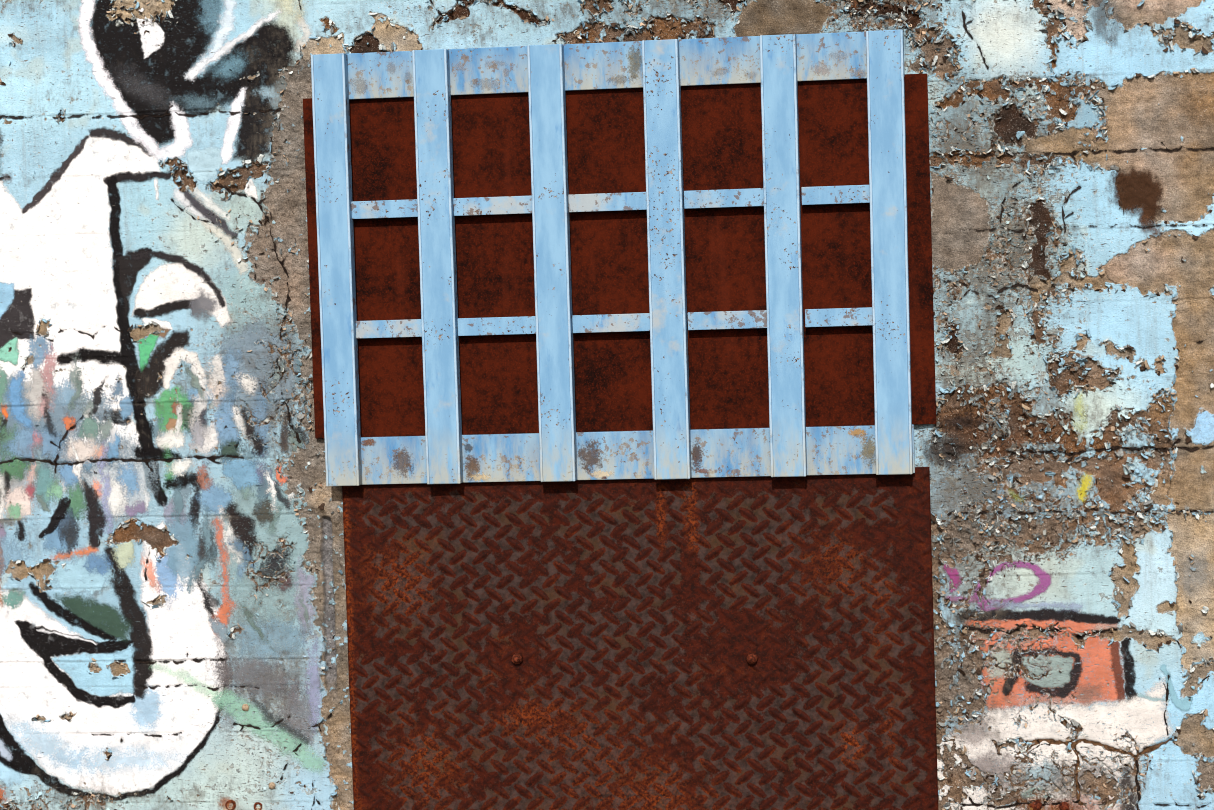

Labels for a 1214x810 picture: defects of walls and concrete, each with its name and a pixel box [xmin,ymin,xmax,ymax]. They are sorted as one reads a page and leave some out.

peeling [106,0,187,46]
crack [945,0,989,69]
peeling [0,31,24,86]
peeling [816,0,1214,810]
corrosion [393,450,413,476]
corrosion [465,444,490,481]
corrosion [578,440,613,479]
corrosion [691,443,708,473]
corrosion [848,429,876,466]
peeling [99,516,192,561]
crack [949,675,1211,810]
peeling [63,787,137,810]